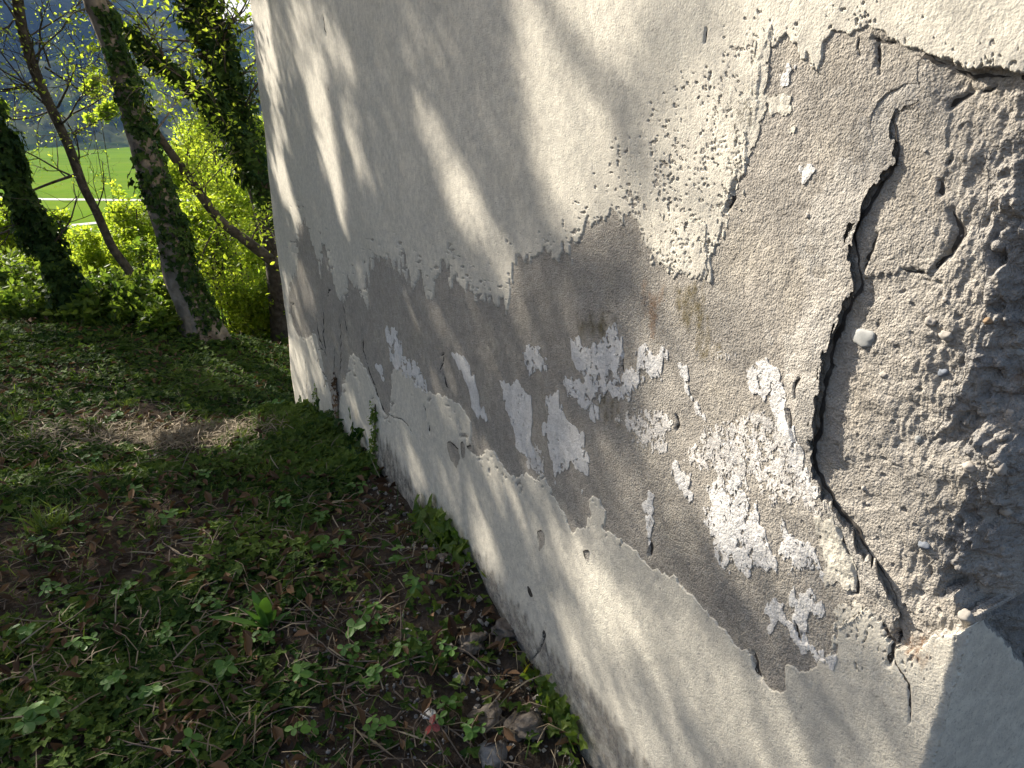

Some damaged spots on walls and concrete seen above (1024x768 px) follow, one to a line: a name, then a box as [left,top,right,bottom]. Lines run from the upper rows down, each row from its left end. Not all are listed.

peeling [287,2,1024,692]
crack [790,100,919,721]
crack [857,37,894,74]